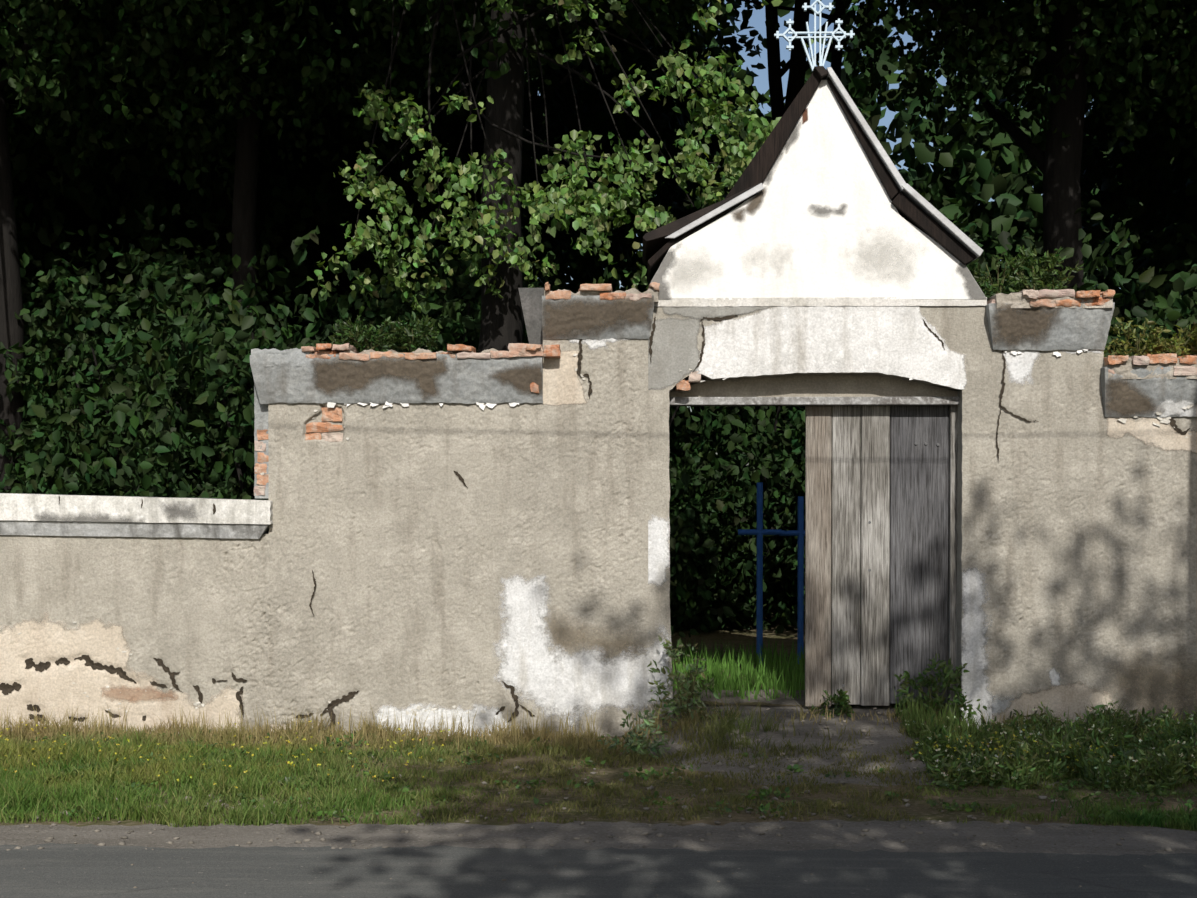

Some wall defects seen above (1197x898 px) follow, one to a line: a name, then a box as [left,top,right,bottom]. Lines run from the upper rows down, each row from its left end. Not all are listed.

crack [573,339,593,399]
flaking render [305,401,409,442]
flaking render [476,402,519,411]
crack [996,350,1039,461]
flaking render [1107,400,1197,453]
flaking render [0,615,244,734]